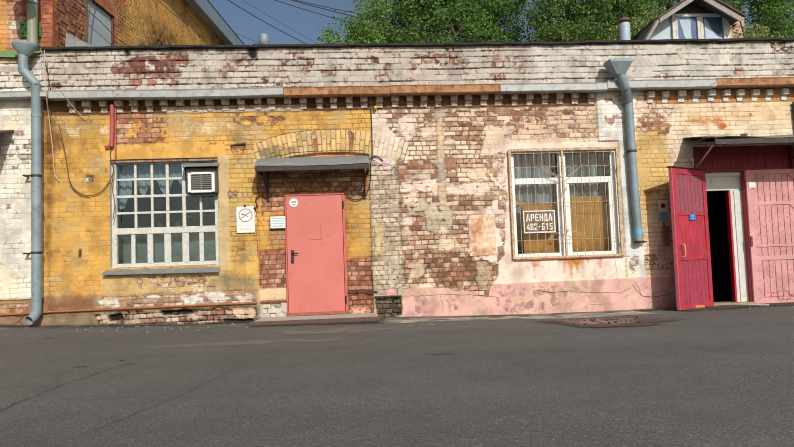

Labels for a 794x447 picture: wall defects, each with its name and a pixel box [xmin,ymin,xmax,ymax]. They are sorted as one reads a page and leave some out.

peeling [8,0,27,46]
peeling [38,0,87,47]
peeling [111,53,189,87]
peeling [98,112,167,145]
peeling [636,100,673,135]
peeling [260,106,622,318]
spalling [96,274,287,326]
crack [537,262,672,306]
spalling [628,255,659,271]